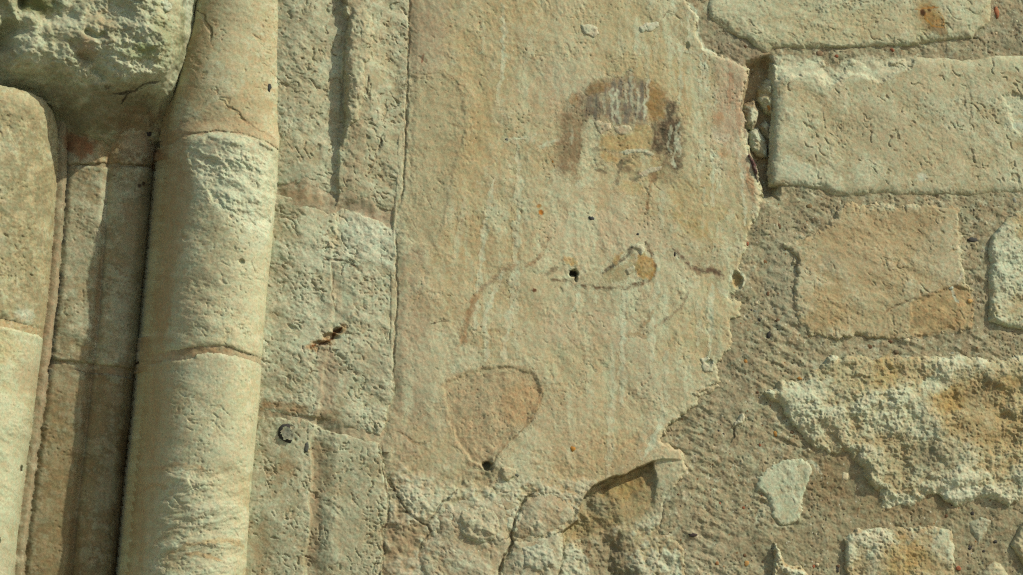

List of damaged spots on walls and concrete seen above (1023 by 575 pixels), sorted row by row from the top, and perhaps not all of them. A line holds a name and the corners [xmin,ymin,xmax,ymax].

water stain [601,0,724,207]
water stain [472,136,527,362]
efflorescence [583,281,629,481]
water stain [637,253,671,461]
water stain [676,270,747,358]
crack [379,431,458,574]
crack [498,492,536,575]
flaking render [559,456,663,575]